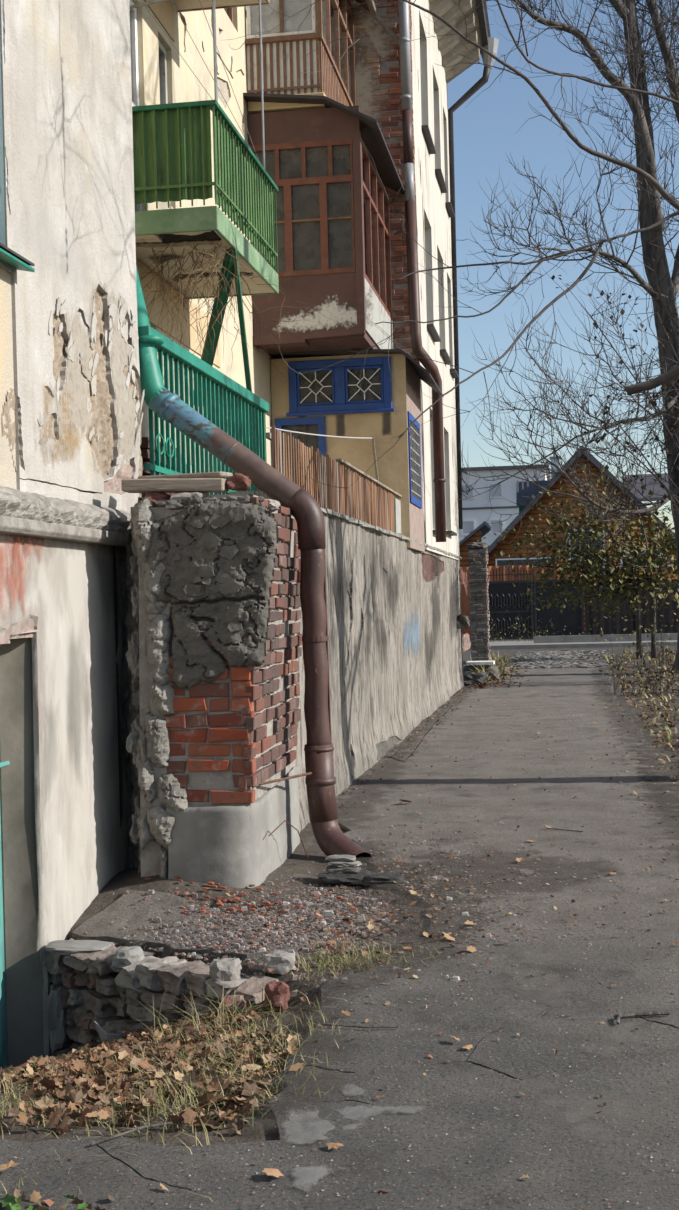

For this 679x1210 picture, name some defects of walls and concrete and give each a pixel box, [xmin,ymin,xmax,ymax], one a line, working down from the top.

flaking render [1,388,22,471]
peeling [38,286,145,494]
peeling [189,505,246,595]